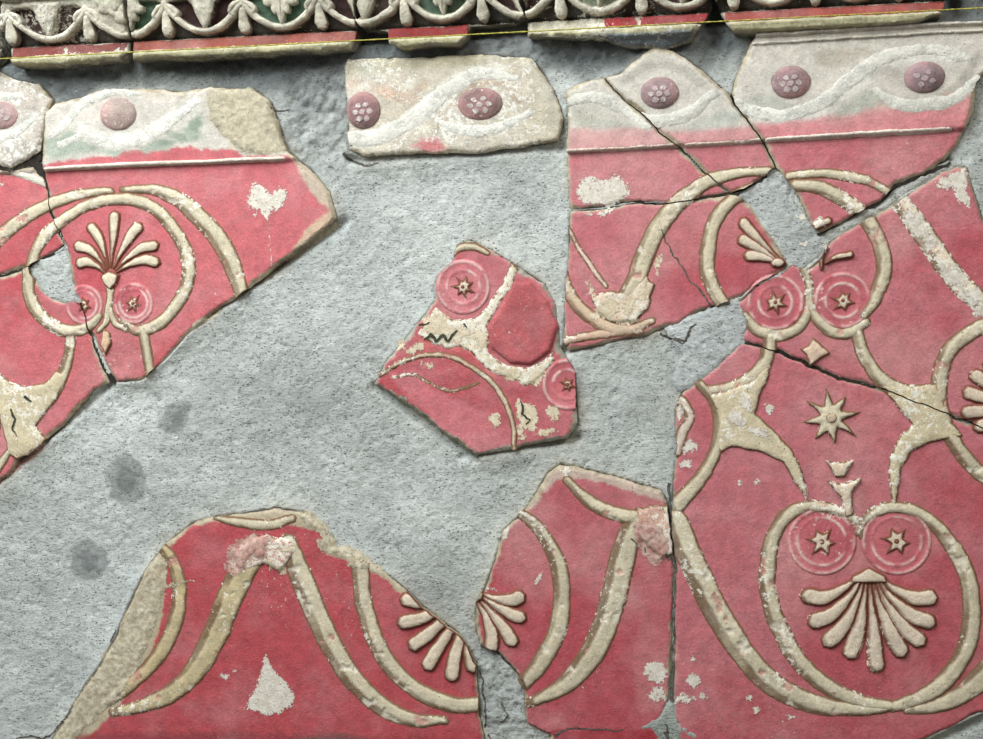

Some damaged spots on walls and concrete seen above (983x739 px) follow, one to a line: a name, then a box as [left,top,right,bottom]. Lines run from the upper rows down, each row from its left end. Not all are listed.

crack [0,152,65,277]
crack [817,161,951,236]
crack [10,395,31,436]
crack [86,317,116,384]
crack [744,342,983,428]
spalling [223,531,294,578]
spalling [633,520,670,566]
crack [631,483,677,739]